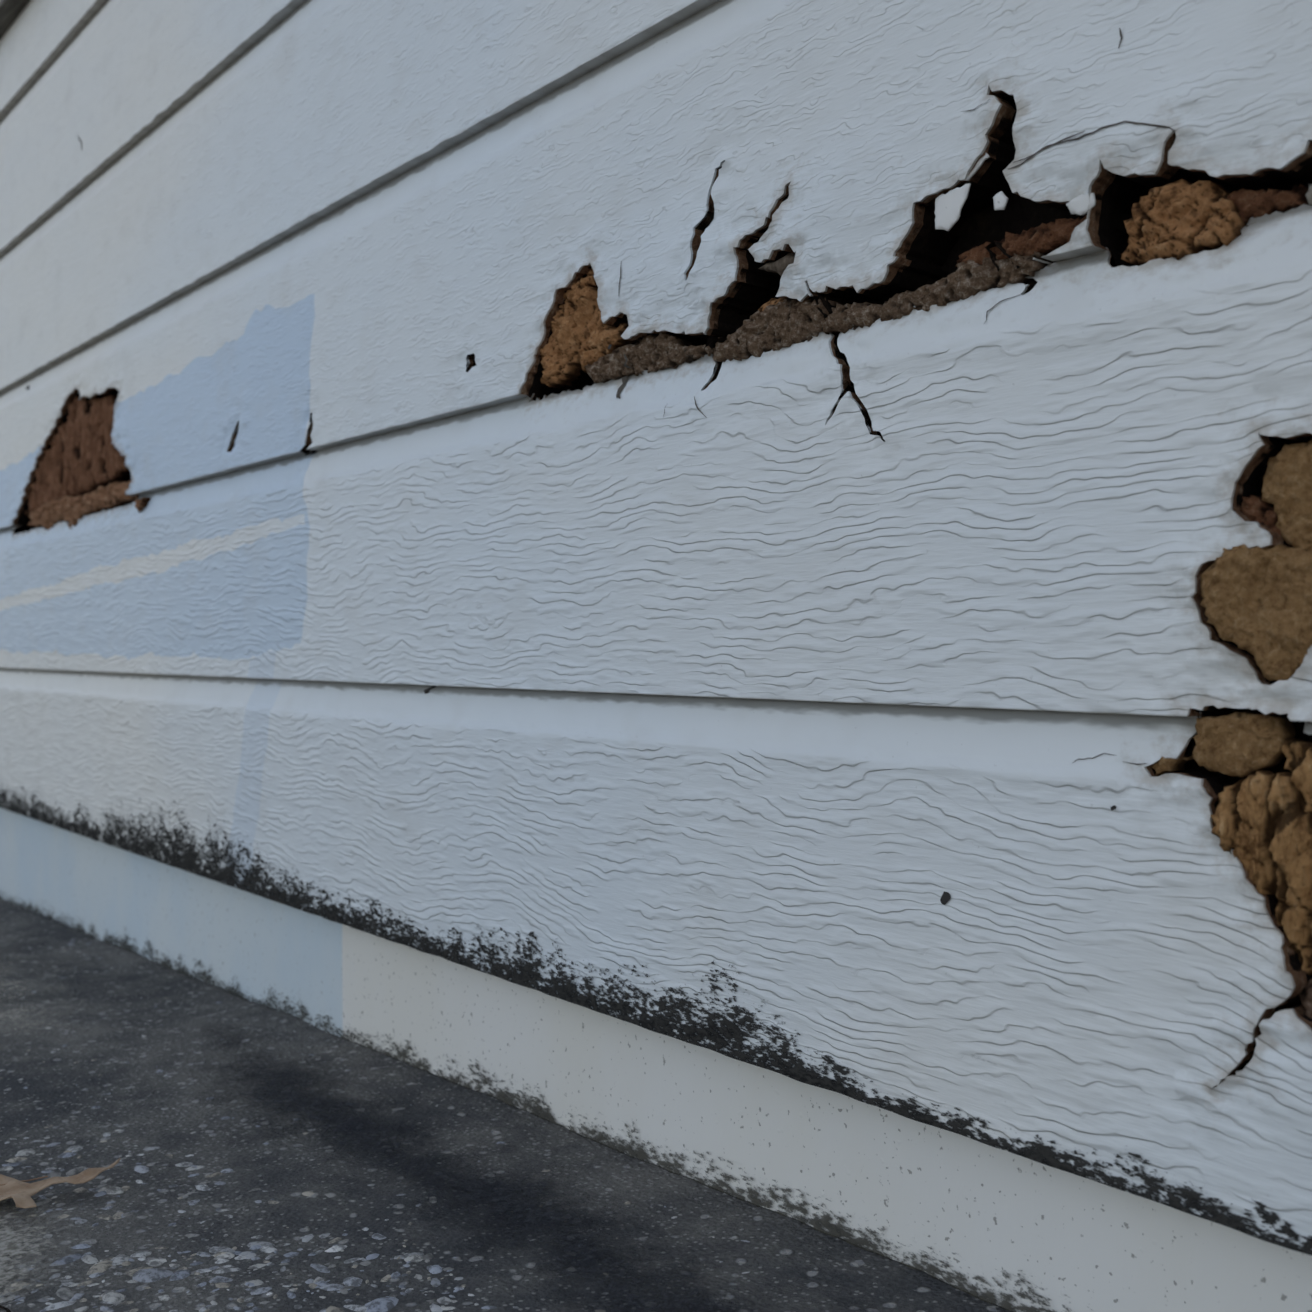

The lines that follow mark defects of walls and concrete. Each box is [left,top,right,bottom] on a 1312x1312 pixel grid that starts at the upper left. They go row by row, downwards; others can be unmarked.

crack [695,203,714,233]
spalling [631,92,1312,348]
spalling [526,266,594,401]
spalling [612,314,628,327]
crack [810,289,885,442]
spalling [16,388,120,534]
spalling [1236,434,1312,508]
spalling [1207,619,1277,684]
spalling [1153,739,1247,811]
spalling [1192,706,1312,742]
mould [0,785,1312,1255]
spalling [1265,894,1312,1022]